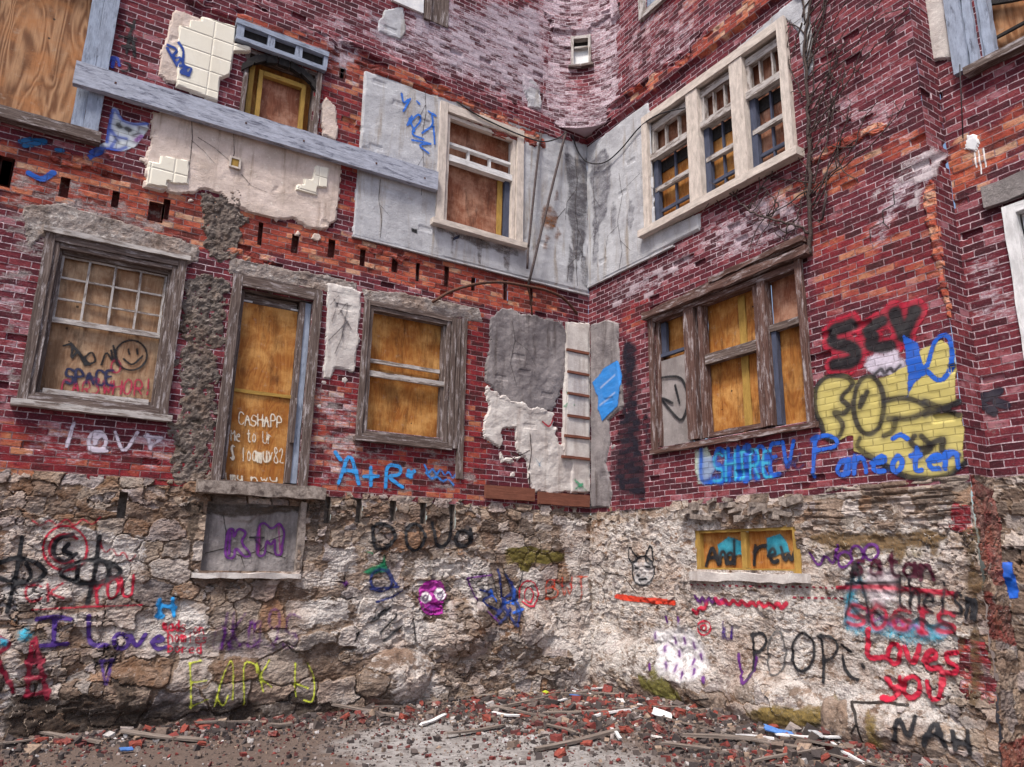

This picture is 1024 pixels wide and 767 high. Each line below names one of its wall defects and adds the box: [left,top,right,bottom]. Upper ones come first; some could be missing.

peeling [158,10,200,84]
peeling [139,112,342,266]
peeling [320,97,338,140]
leakage [565,149,610,287]
spalling [167,269,231,484]
peeling [482,308,624,508]